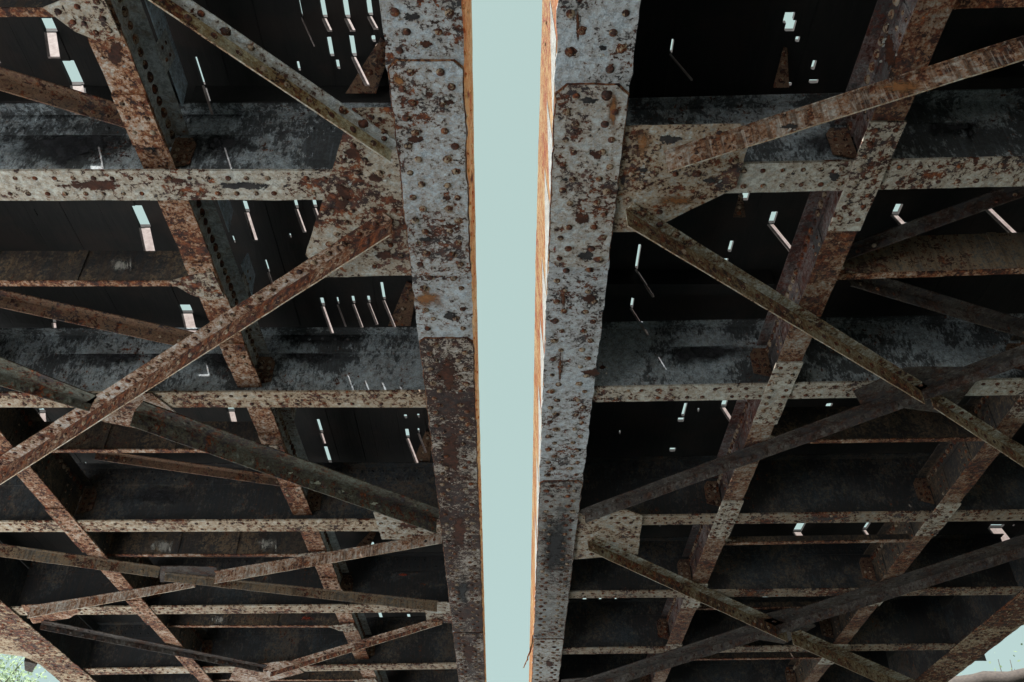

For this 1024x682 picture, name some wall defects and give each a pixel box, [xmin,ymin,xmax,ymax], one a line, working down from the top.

rust [100,41,128,68]
rust [421,92,454,109]
rust [342,147,362,162]
rust [54,178,127,195]
rust [327,181,360,215]
rust [574,207,589,229]
rust [374,248,395,264]
rust [416,292,440,305]
rust [581,363,608,382]
rust [438,426,463,484]